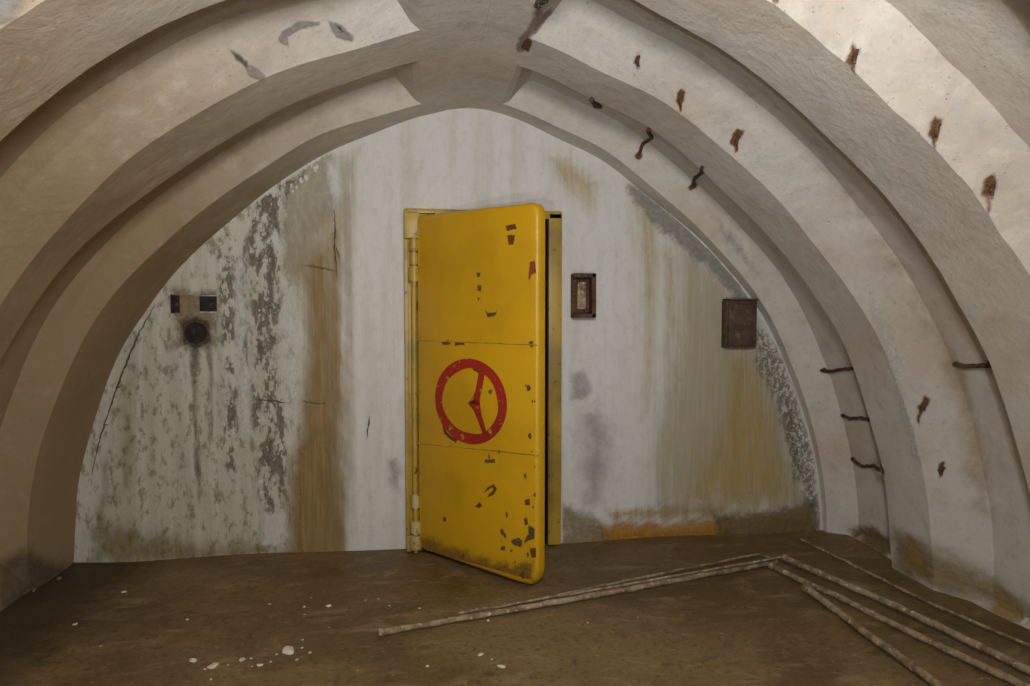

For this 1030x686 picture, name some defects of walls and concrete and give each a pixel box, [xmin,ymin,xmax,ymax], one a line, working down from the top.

spalling [232,52,265,80]
peeling [279,21,353,44]
damp [230,212,340,555]
damp [630,187,819,535]